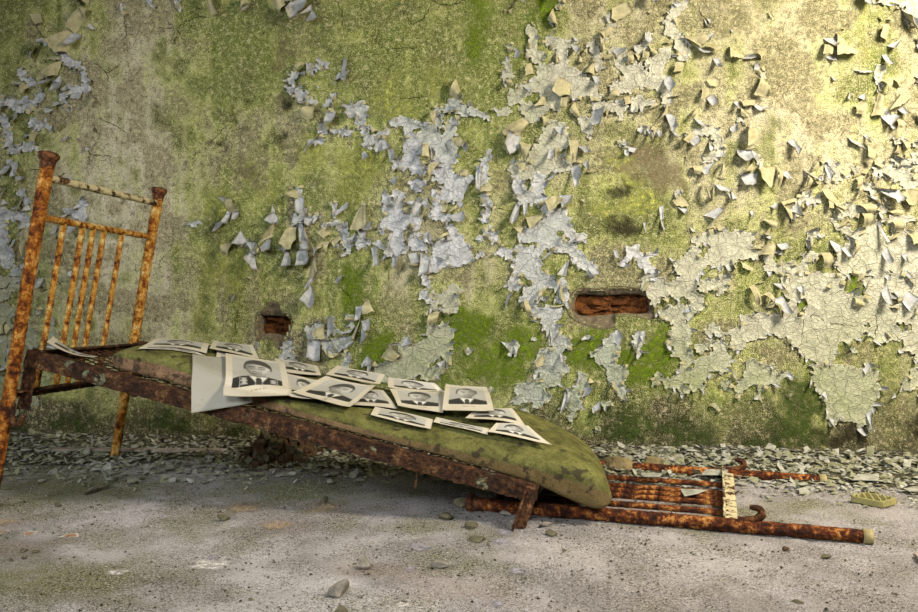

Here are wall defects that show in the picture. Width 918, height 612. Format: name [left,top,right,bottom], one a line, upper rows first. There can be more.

water stain [609,146,686,196]
peeling [0,0,95,400]
peeling [212,195,239,232]
water stain [608,216,640,237]
peeling [220,0,918,511]
water stain [829,426,864,447]
peeling [3,427,482,497]